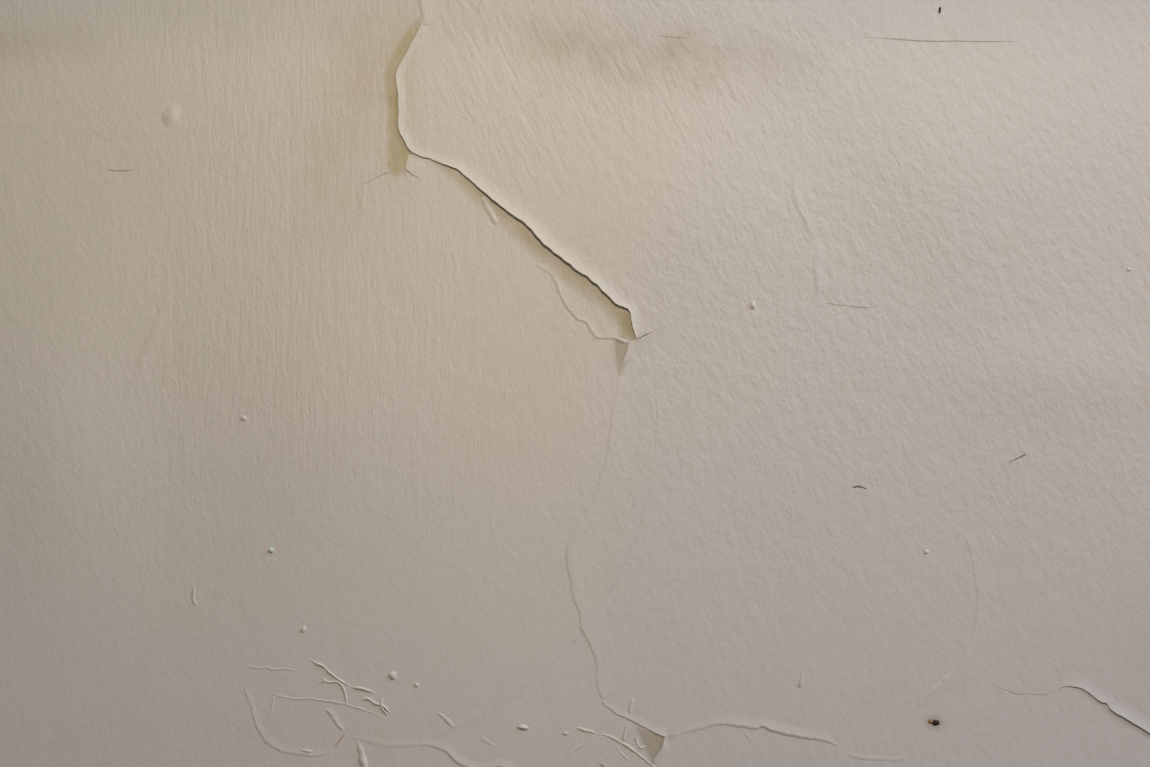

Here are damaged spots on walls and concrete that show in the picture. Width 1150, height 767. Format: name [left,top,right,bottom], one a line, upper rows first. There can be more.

crack [363,0,903,765]
crack [991,678,1150,734]